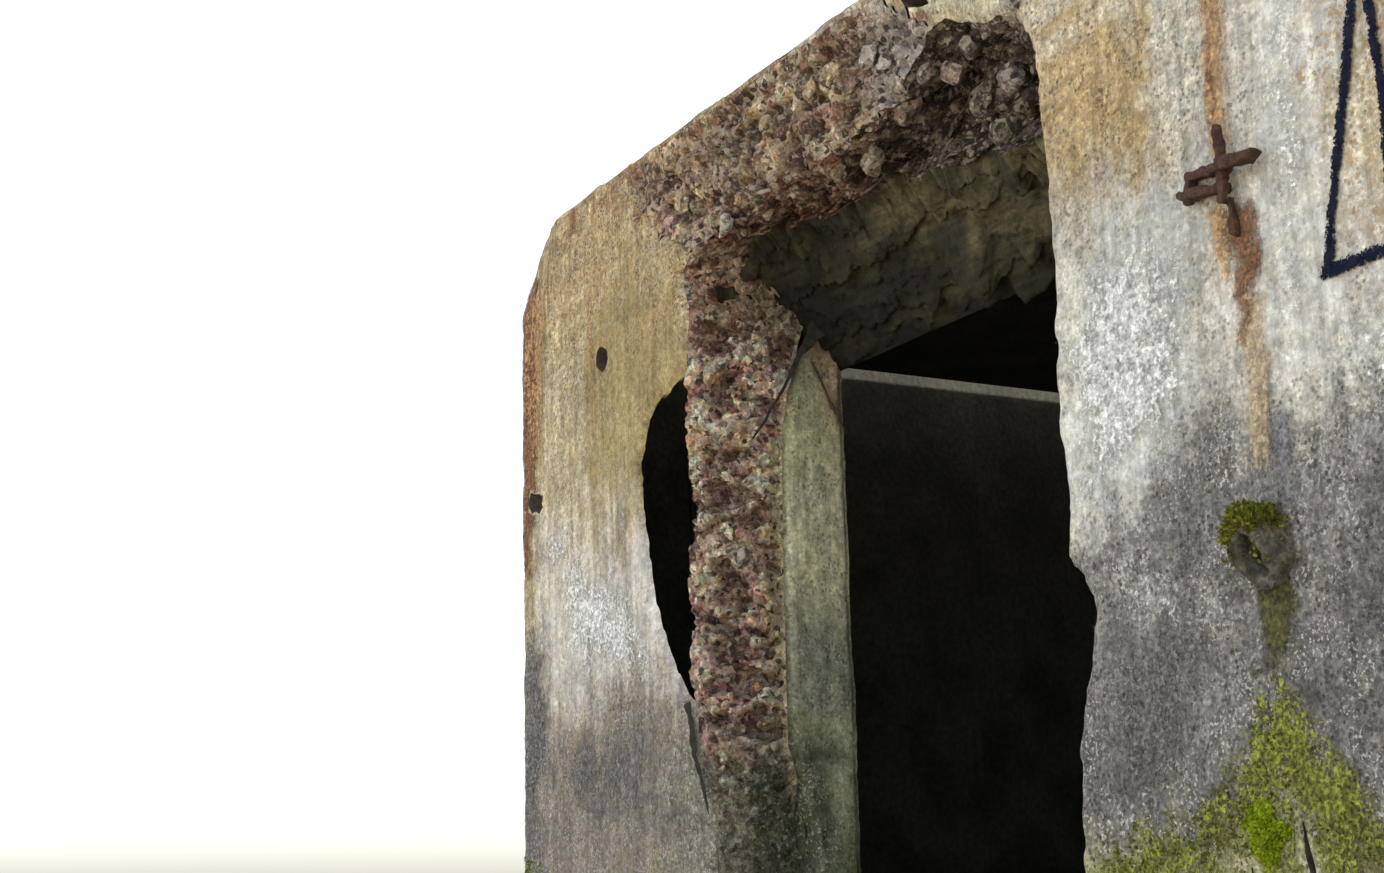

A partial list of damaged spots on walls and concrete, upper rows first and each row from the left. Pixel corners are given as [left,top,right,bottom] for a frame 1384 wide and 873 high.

spalling [631,0,934,252]
corrosion [522,279,548,579]
crack [1302,821,1316,873]